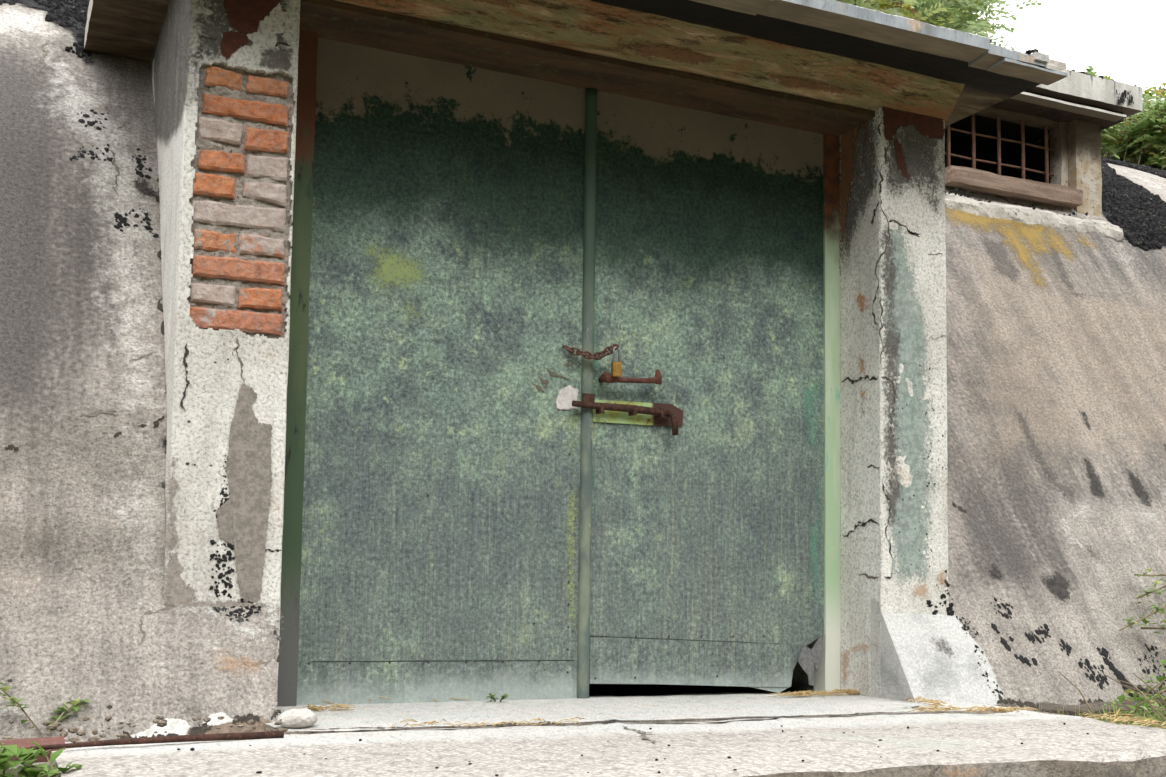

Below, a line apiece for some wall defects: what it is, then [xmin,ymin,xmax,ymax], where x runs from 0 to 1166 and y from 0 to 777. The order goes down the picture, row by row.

spalling [187,0,295,339]
crack [842,123,942,434]
water stain [985,240,1019,280]
water stain [1050,246,1083,297]
crack [232,335,244,380]
flaking render [161,383,282,639]
crack [842,464,893,579]